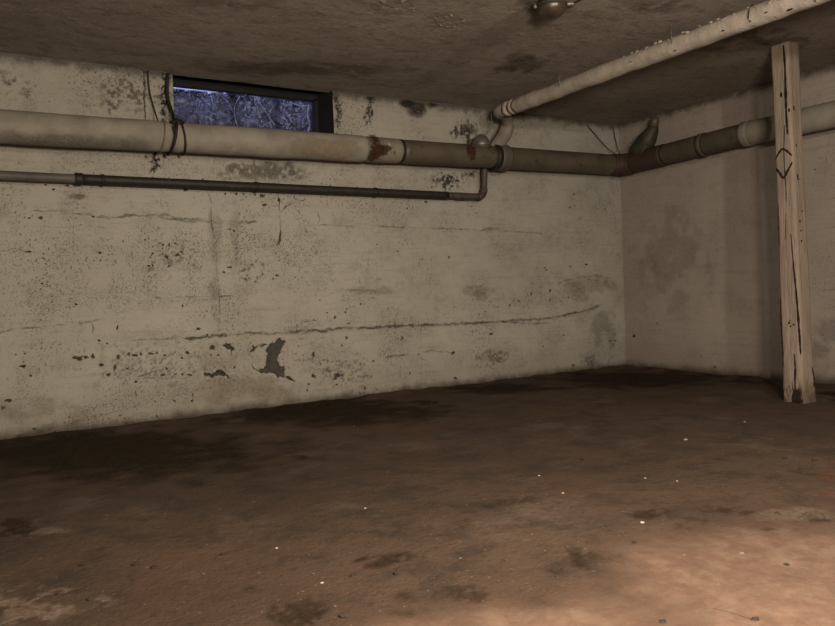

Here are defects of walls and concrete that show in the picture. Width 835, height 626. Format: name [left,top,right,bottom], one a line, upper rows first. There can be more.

corrosion [369,135,392,161]
spalling [249,338,295,382]